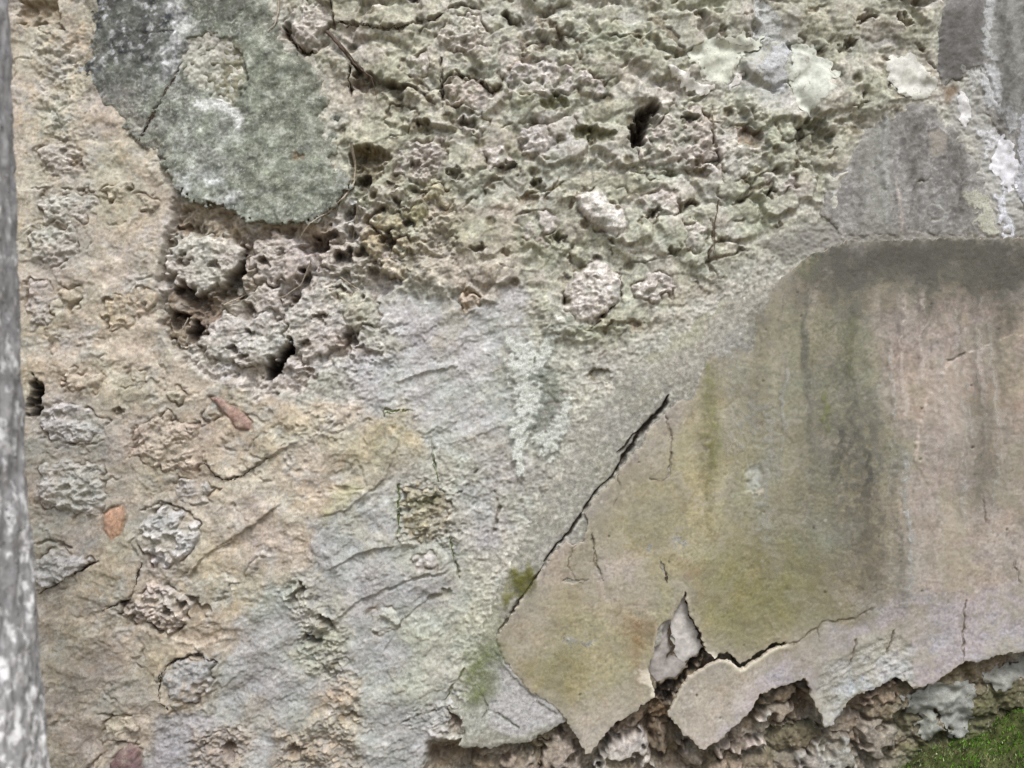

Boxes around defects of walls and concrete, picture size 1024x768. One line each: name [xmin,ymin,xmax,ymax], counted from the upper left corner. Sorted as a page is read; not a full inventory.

spalling [501,10,528,31]
crack [139,67,179,141]
flaking render [74,0,479,397]
spalling [467,241,488,259]
spalling [493,159,519,178]
spalling [528,173,667,332]
spalling [665,246,683,258]
spalling [619,30,779,212]
water stain [792,238,1024,590]
crack [509,396,673,616]
flaking render [427,560,1024,768]
crack [790,607,873,664]